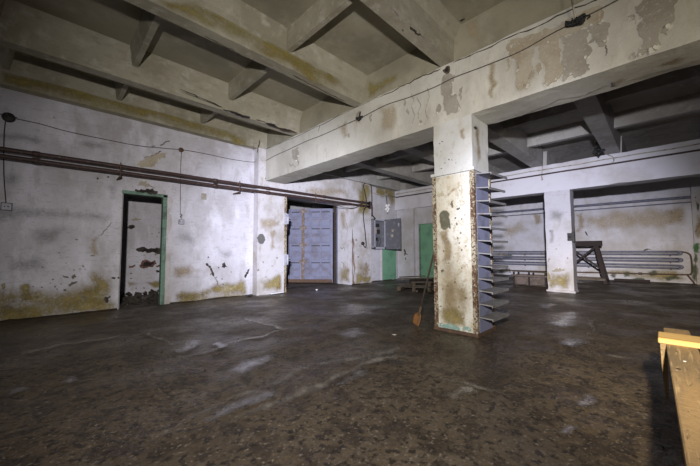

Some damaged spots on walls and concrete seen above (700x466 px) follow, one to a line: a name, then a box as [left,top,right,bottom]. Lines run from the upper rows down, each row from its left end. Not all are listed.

peeling [506,5,610,90]
peeling [626,0,678,59]
peeling [436,66,463,115]
peeling [137,151,166,167]
water stain [0,275,112,320]
flaking render [128,247,160,279]
water stain [179,282,245,302]
water stain [442,222,464,324]